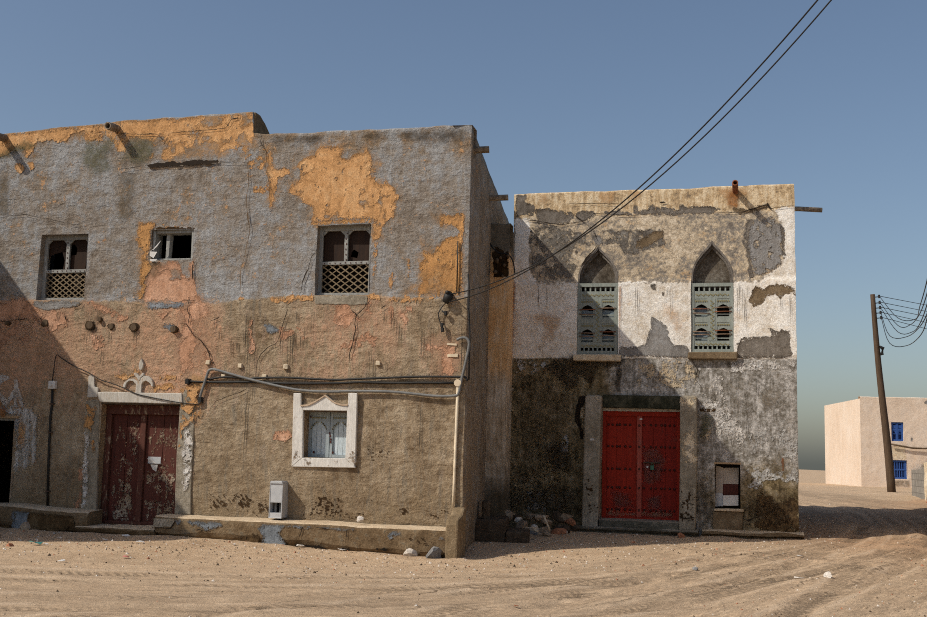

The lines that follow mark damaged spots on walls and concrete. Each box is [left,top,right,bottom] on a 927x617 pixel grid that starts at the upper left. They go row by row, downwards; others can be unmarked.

peeling [111,221,213,525]
crack [117,117,270,293]
peeling [0,112,399,275]
crack [181,261,219,366]
crack [349,301,385,361]
peeling [331,213,465,328]
spalling [492,247,509,277]
damp [547,358,623,392]
spalling [515,194,720,280]
spalling [618,317,799,532]
spalling [733,203,795,307]
peeling [892,438,913,460]